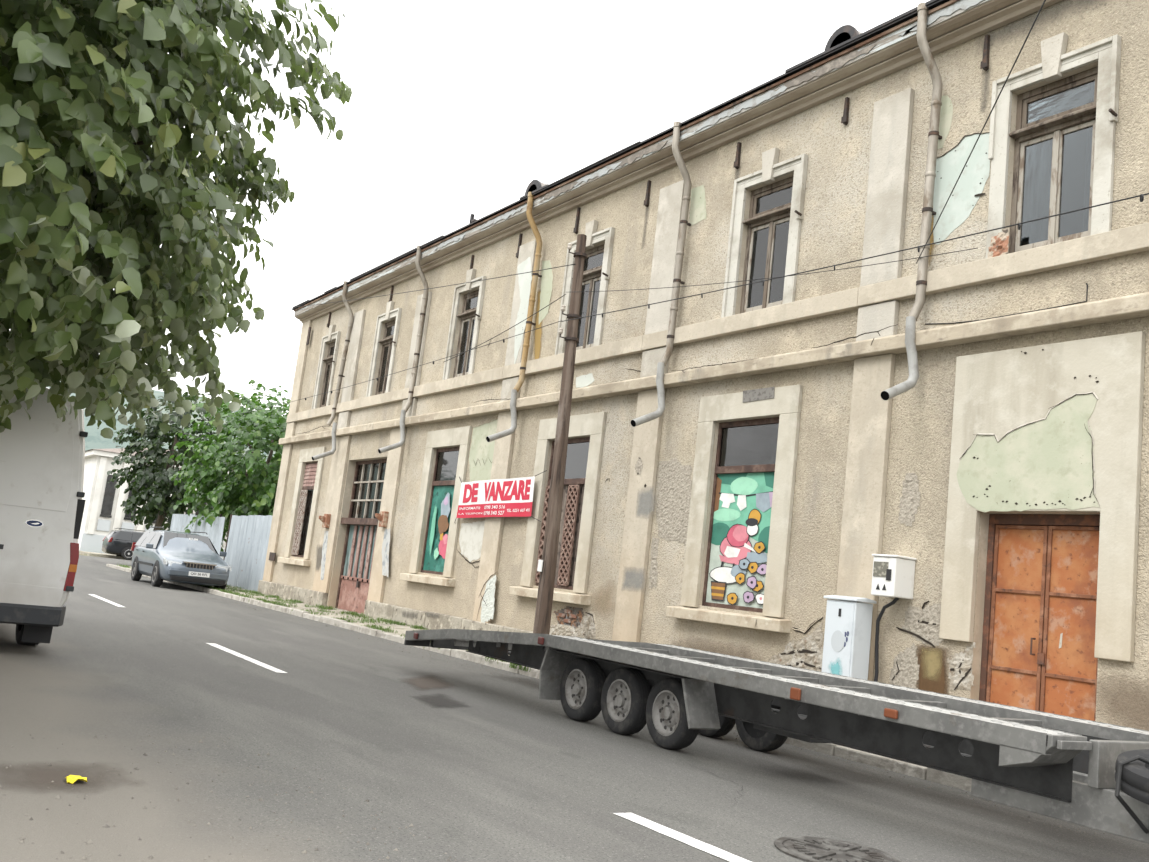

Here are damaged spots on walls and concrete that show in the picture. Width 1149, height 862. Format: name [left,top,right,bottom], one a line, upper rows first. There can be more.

flaking render [933,96,990,244]
flaking render [956,375,1099,512]
flaking render [459,521,485,562]
flaking render [767,617,823,672]
flaking render [890,601,944,689]
flaking render [947,642,976,691]